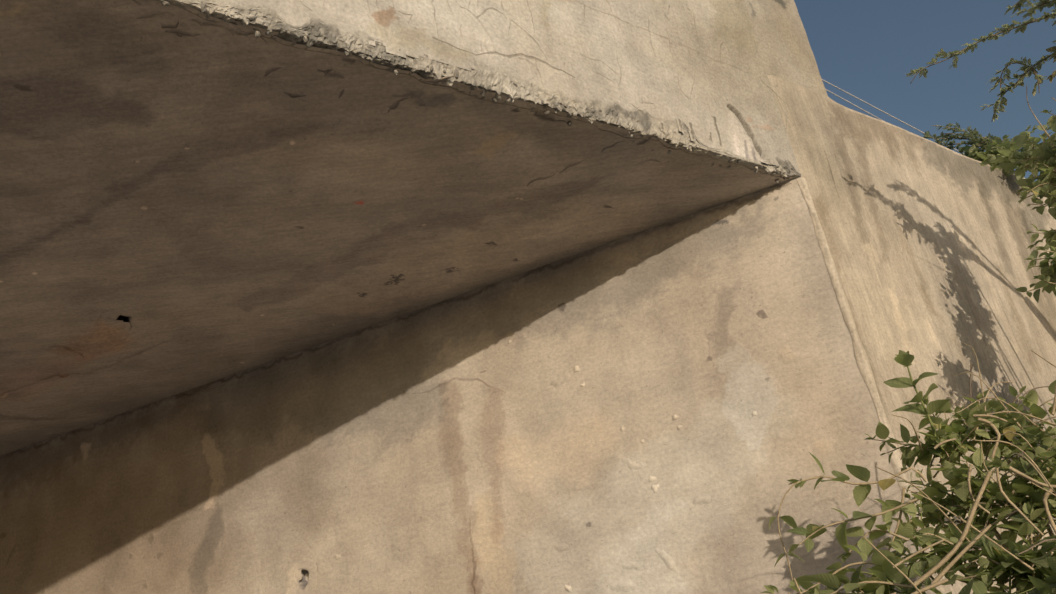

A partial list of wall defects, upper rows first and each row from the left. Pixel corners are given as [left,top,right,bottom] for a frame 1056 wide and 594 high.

damp [0,0,184,144]
damp [0,118,350,271]
crack [0,0,839,460]
damp [187,180,806,594]
spalling [156,0,921,532]
damp [705,0,760,58]